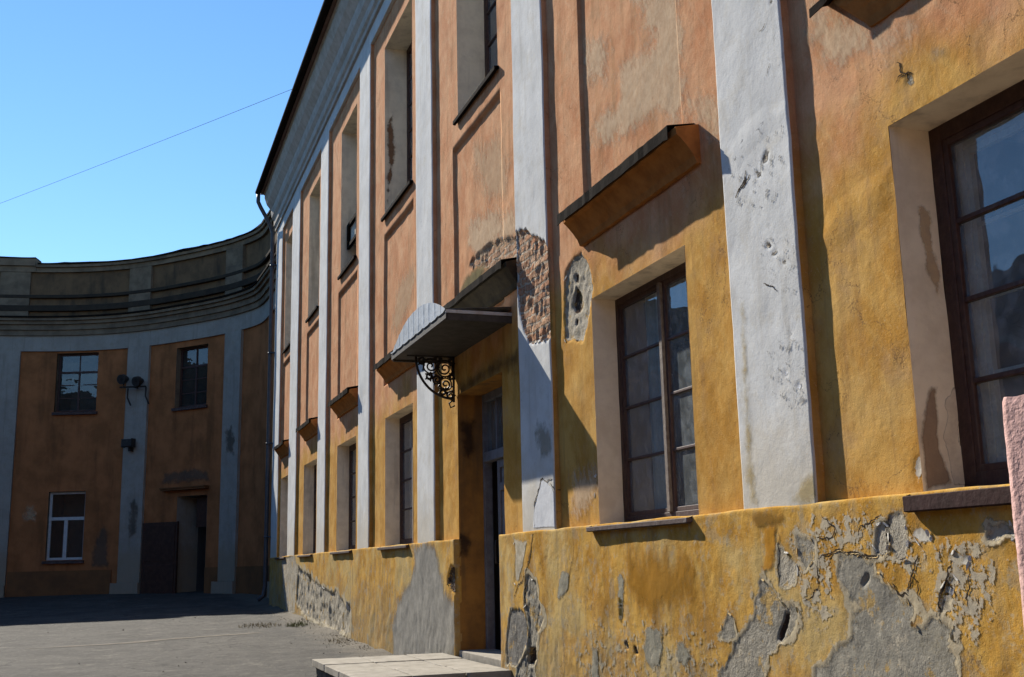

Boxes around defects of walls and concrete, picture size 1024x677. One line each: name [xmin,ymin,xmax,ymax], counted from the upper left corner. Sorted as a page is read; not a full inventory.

peeling [729,122,785,208]
flaking render [468,210,551,344]
spalling [564,253,593,342]
leakage [922,389,951,489]
peeling [533,480,555,528]
spalling [282,556,352,639]
spalling [447,566,455,592]
spalling [505,539,547,677]
spalling [576,508,1016,677]
crack [805,515,892,601]